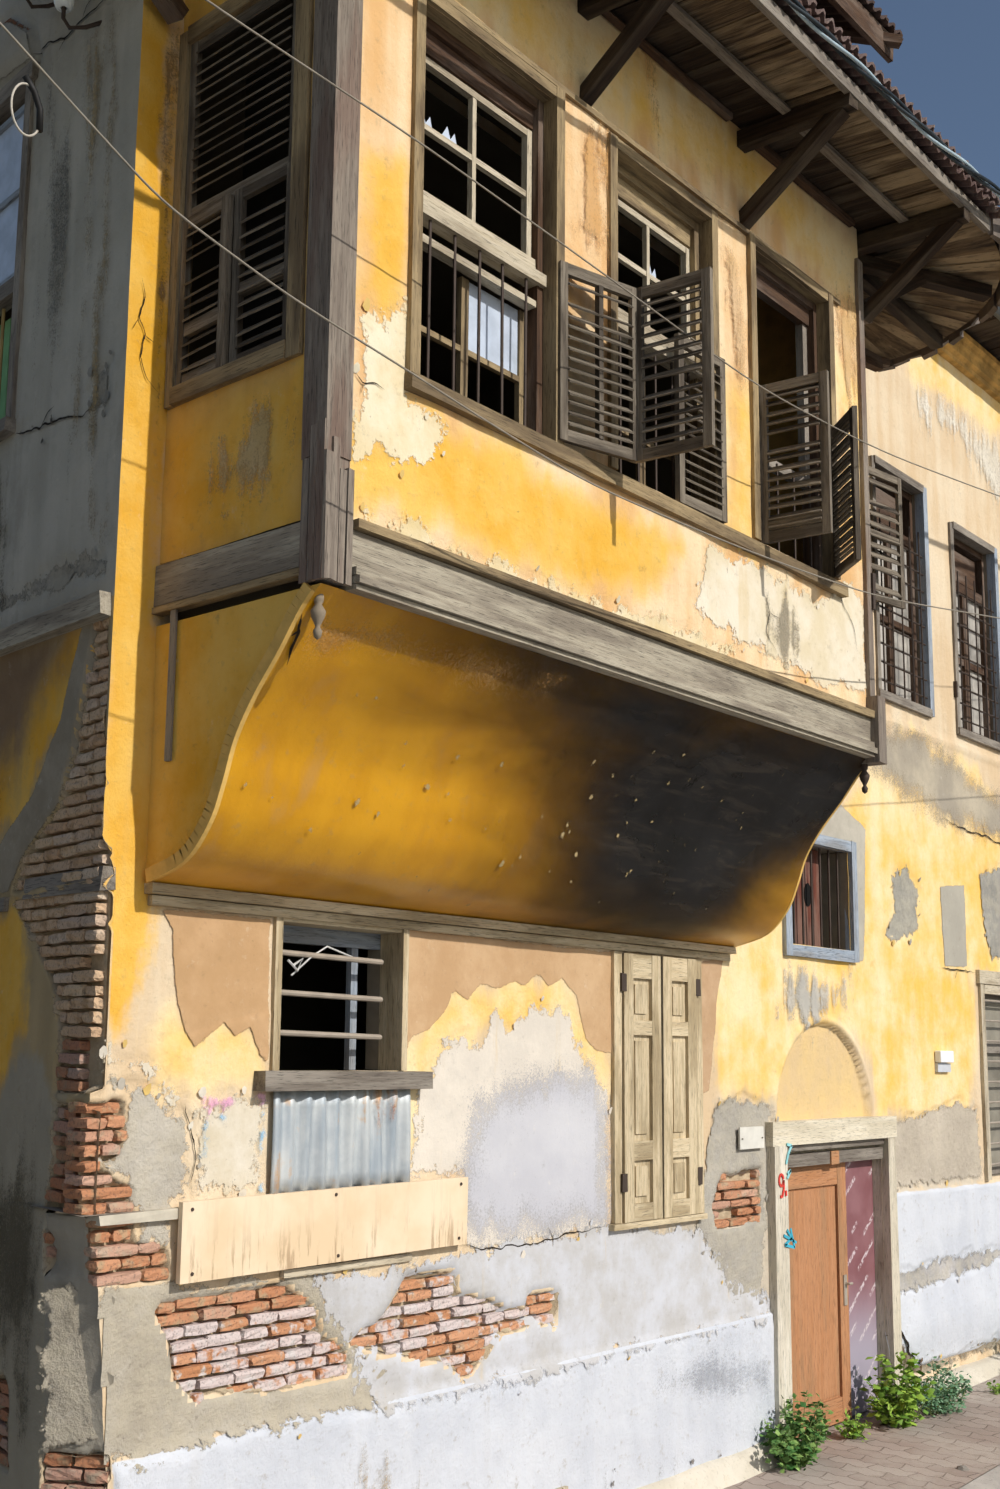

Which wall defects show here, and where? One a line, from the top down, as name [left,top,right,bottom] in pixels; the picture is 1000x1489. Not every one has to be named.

crack [16,405,104,434]
crack [133,280,157,391]
peeling [352,296,449,478]
peeling [360,502,866,694]
water stain [766,592,800,668]
peeling [0,618,771,1489]